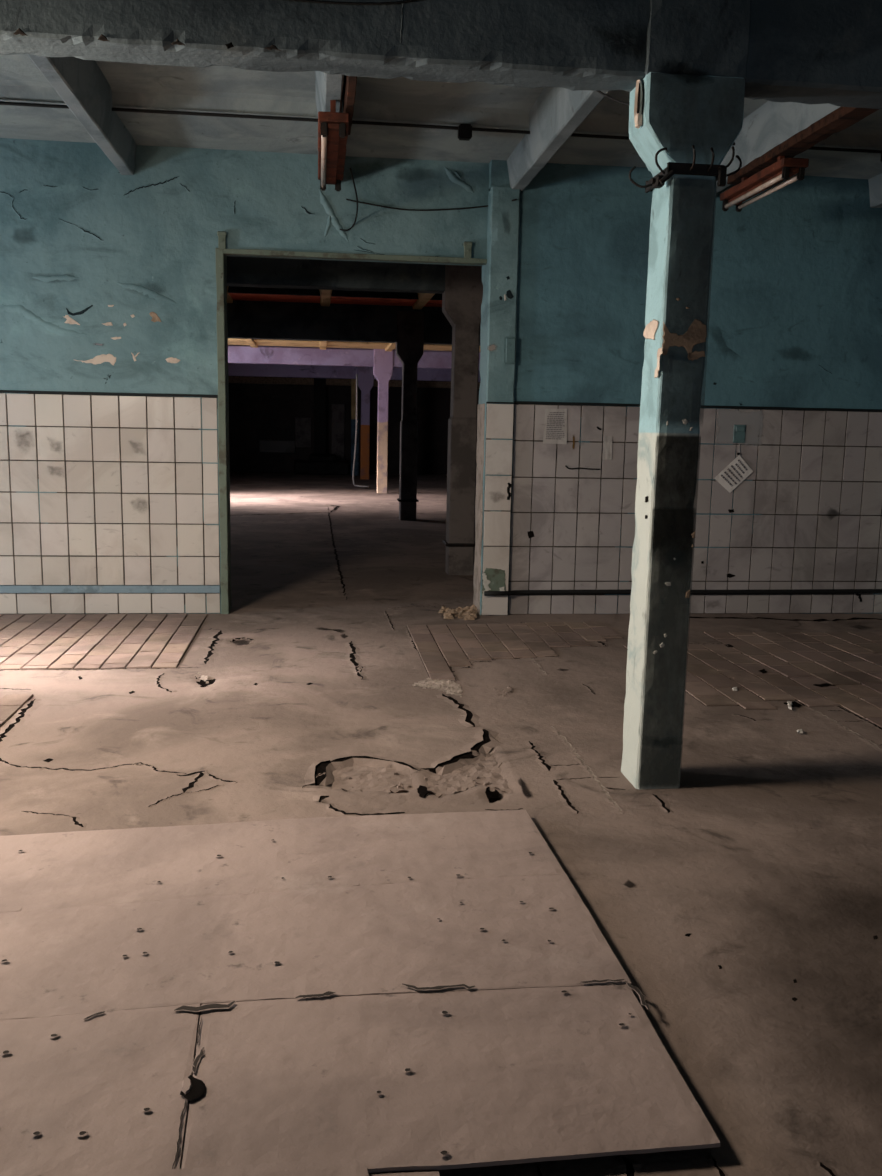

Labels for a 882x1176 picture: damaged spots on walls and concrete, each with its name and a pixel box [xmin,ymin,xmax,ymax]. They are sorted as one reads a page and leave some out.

crack [0,171,190,221]
crack [58,218,104,242]
peeling [75,354,116,366]
peeling [643,298,707,378]
crack [344,641,369,681]
spalling [301,693,530,817]
crack [0,757,239,807]